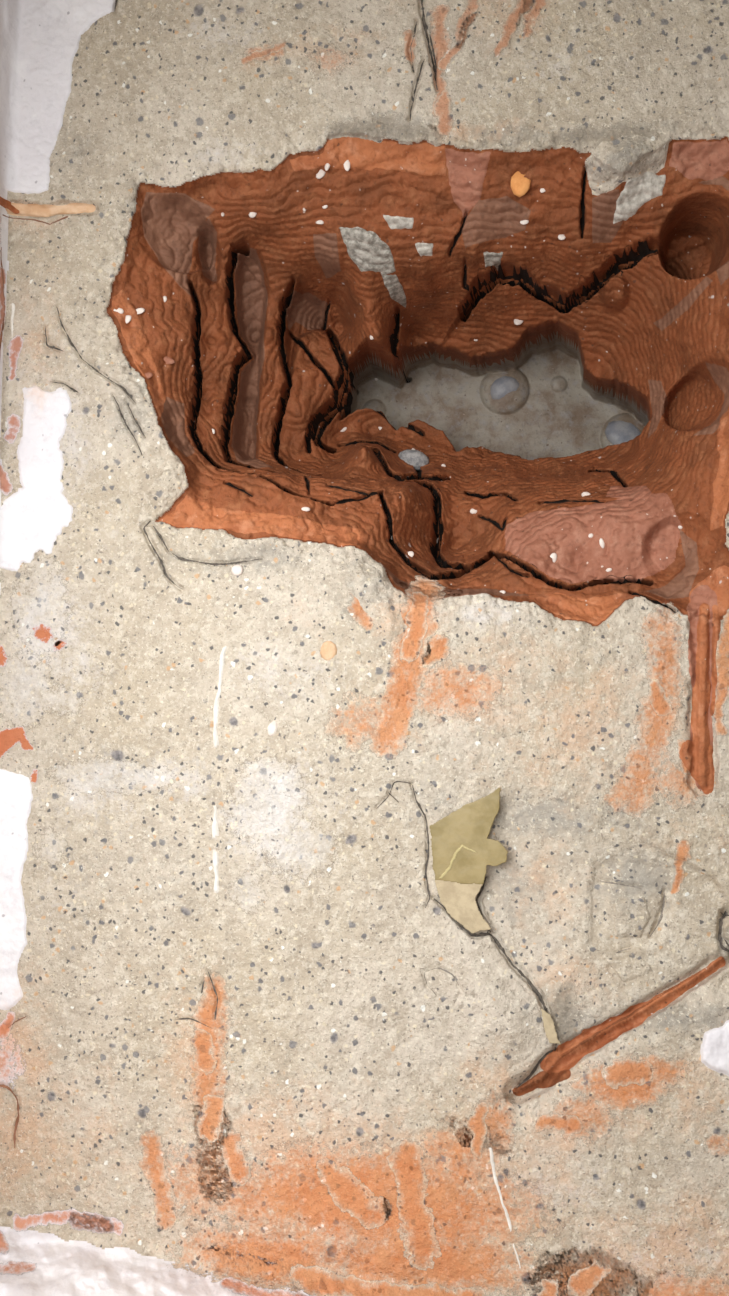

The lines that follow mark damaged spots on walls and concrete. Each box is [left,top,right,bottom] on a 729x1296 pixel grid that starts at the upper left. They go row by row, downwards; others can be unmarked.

peeling [0,0,116,194]
crack [409,0,438,121]
spalling [106,136,729,626]
peeling [0,386,73,571]
crack [143,521,259,588]
corrosion [322,575,506,759]
corrosion [602,602,711,820]
crack [376,781,548,1013]
crack [718,911,729,952]
corrosion [137,971,729,1296]
peeling [700,1020,729,1077]
corrosion [0,1208,124,1275]